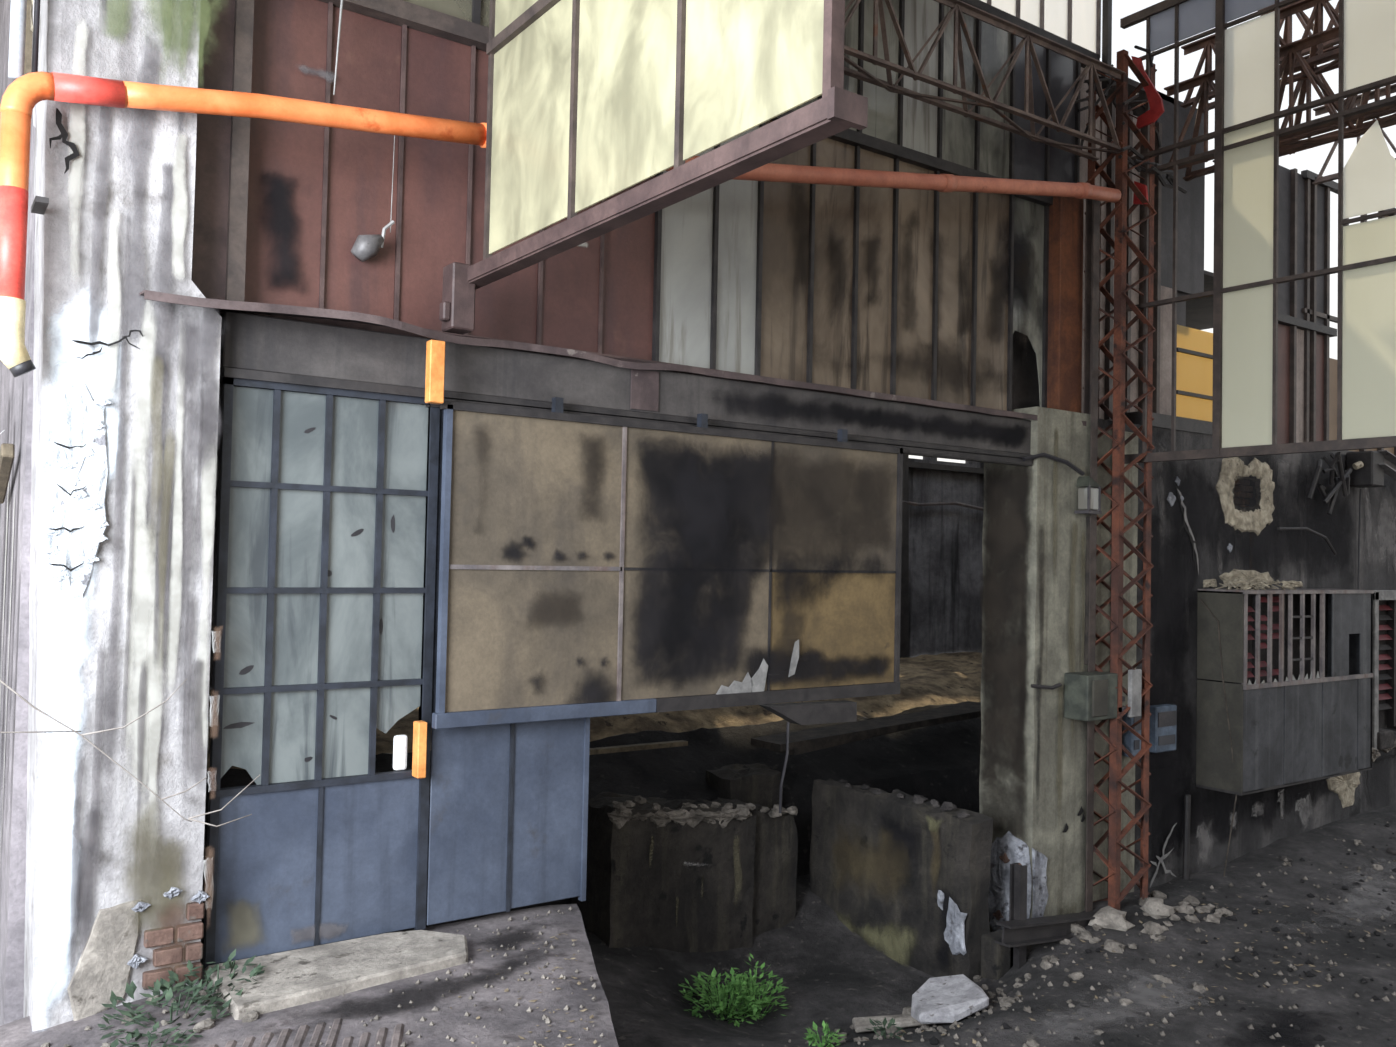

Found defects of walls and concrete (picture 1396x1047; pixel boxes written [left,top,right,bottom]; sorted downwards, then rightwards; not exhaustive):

leakage [73,22,87,76]
leakage [138,0,209,84]
peeling [50,294,121,477]
leakage [68,103,219,967]
spalling [1215,457,1275,536]
spalling [988,831,1049,931]
peeling [1196,823,1213,861]
peeling [1230,789,1311,827]
spalling [1326,739,1396,808]